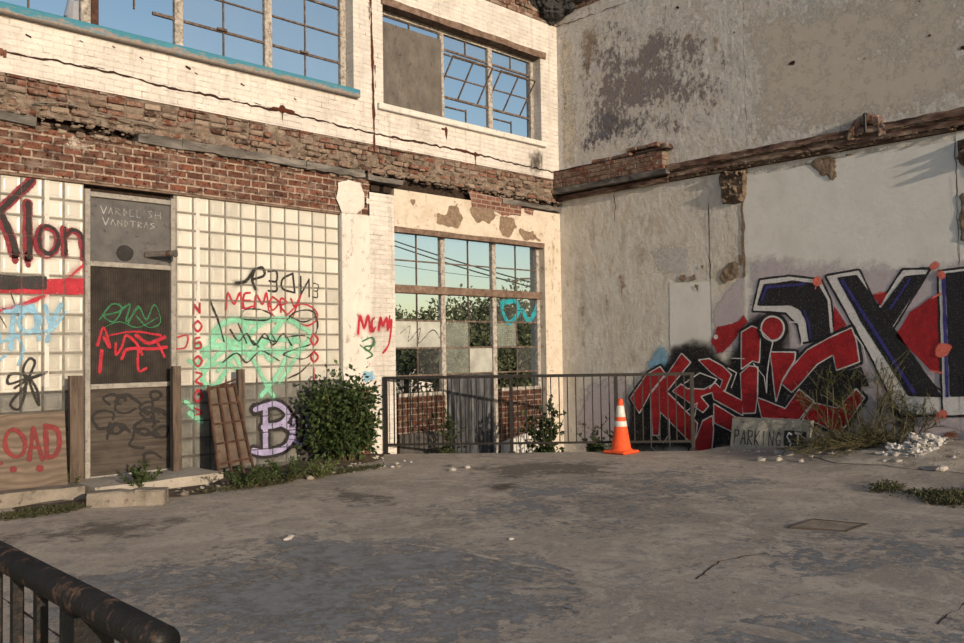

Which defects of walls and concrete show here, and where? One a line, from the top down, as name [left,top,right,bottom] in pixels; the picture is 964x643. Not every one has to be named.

spalling [0,72,562,242]
flaking render [805,154,853,180]
crack [695,553,764,579]